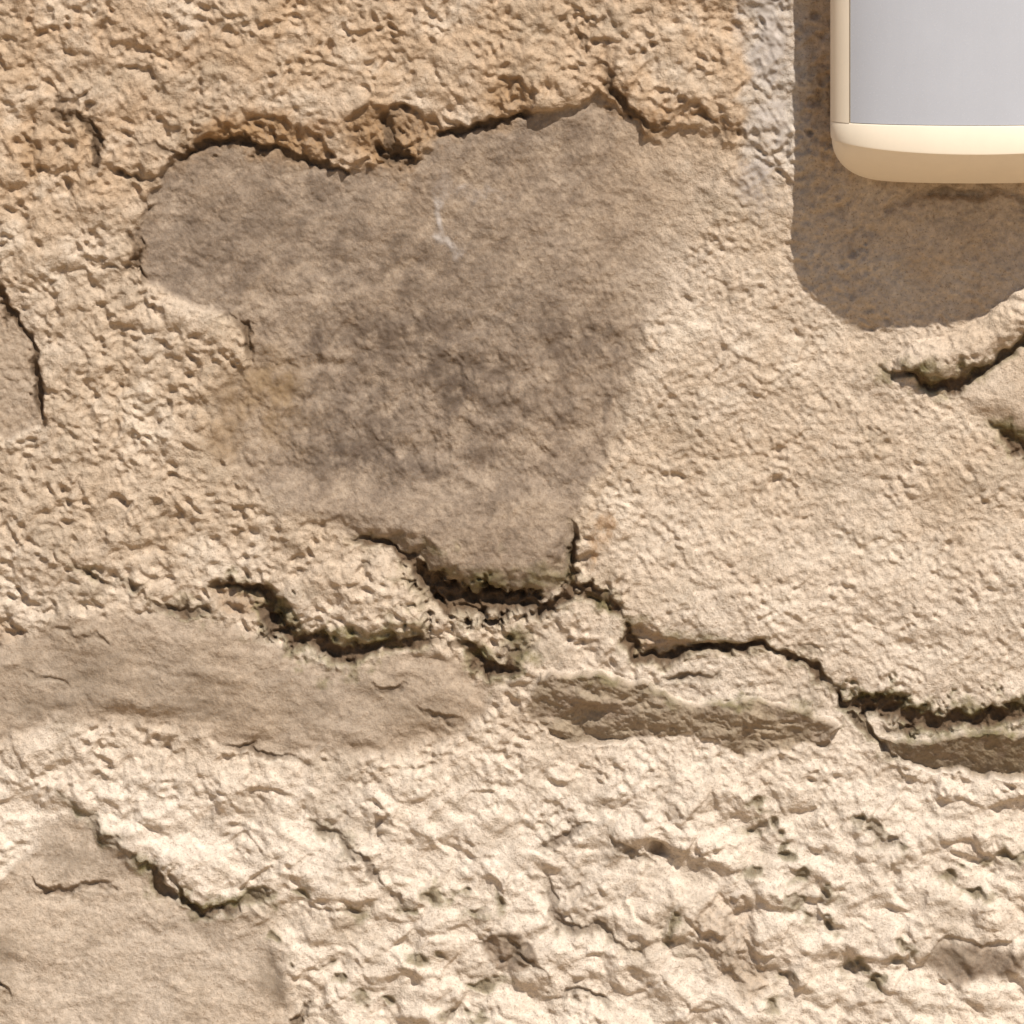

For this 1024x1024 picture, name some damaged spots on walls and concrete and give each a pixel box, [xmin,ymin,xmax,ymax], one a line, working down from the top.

spalling [486,75,536,118]
spalling [195,114,336,162]
spalling [342,100,442,167]
water stain [435,201,454,247]
crack [0,281,48,430]
crack [877,333,1024,399]
spalling [0,617,27,646]
crack [48,624,111,648]
crack [71,520,1024,763]
crack [26,669,70,686]